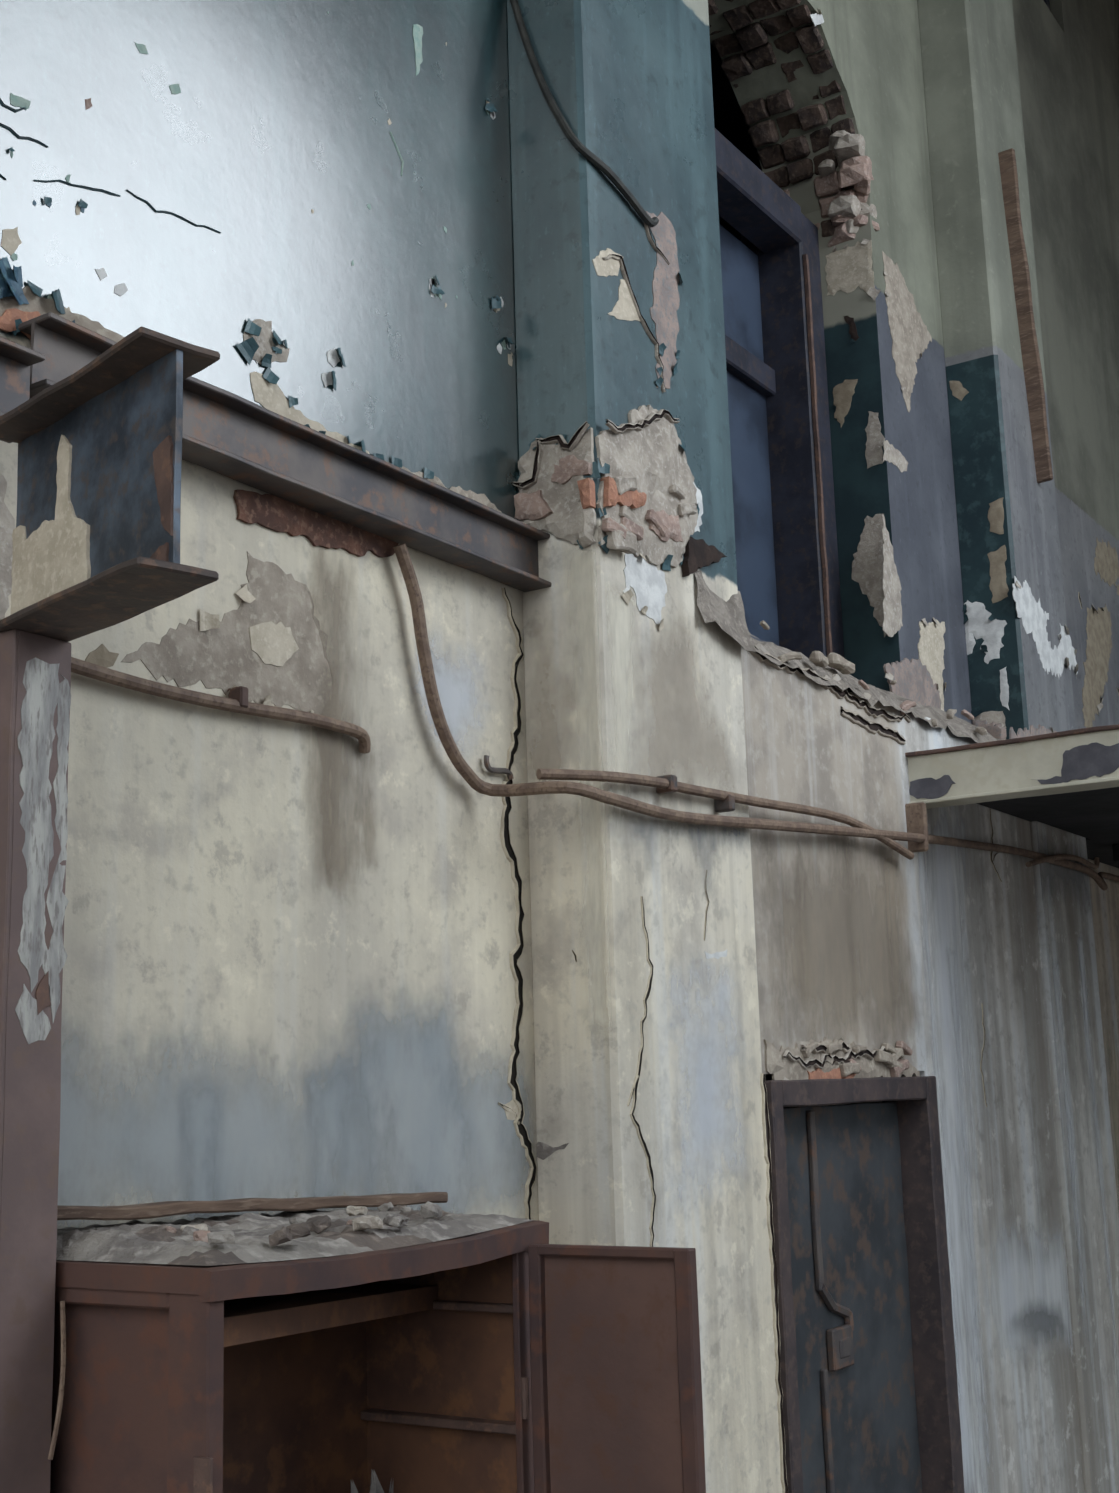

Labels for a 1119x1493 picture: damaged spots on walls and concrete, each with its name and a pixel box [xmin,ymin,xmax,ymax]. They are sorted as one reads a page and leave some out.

peeling [810,8,824,27]
crack [0,98,221,233]
spalling [818,130,932,412]
spalling [0,473,15,620]
spalling [233,211,1119,784]
crack [498,588,569,1220]
leakage [58,1010,530,1224]
crack [627,896,656,1247]
spalling [764,1037,920,1080]